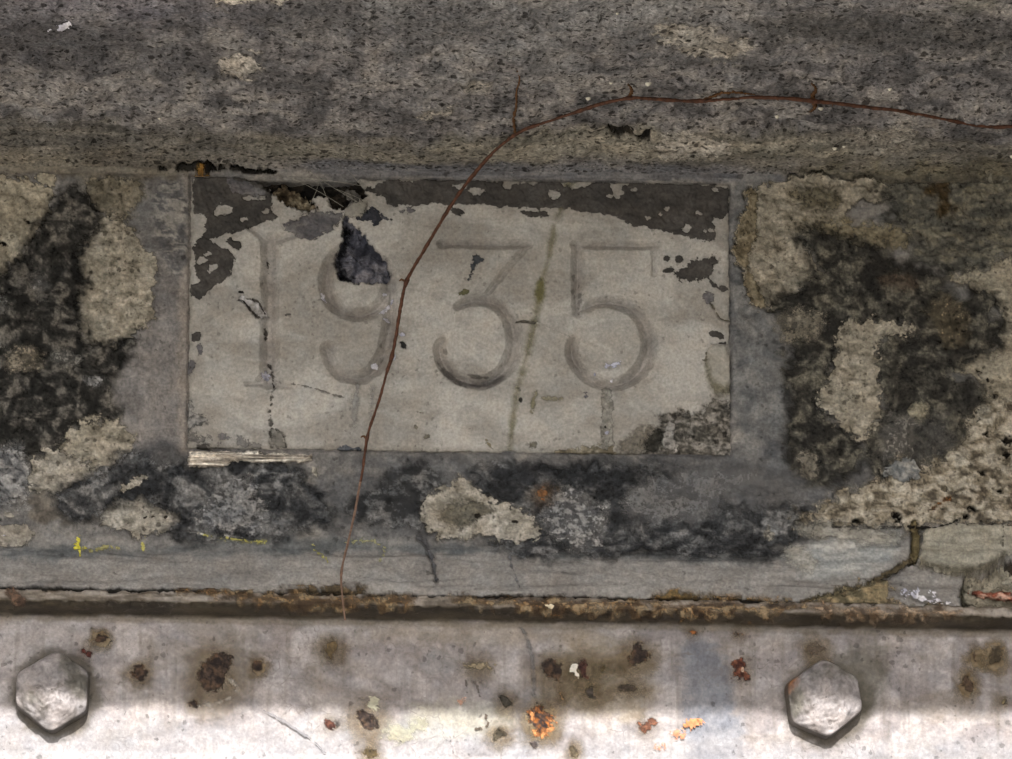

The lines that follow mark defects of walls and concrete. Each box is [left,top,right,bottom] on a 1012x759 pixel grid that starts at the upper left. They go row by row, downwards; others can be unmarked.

peeling [190,171,913,312]
water stain [0,184,137,511]
water stain [771,167,1012,487]
spalling [100,497,179,540]
spalling [419,473,542,545]
water stain [539,487,607,550]
crack [800,519,958,603]
corrosion [175,588,415,614]
corrosion [452,594,962,634]
corrosion [188,647,270,708]
corrosion [475,714,512,746]
corrosion [521,639,658,749]